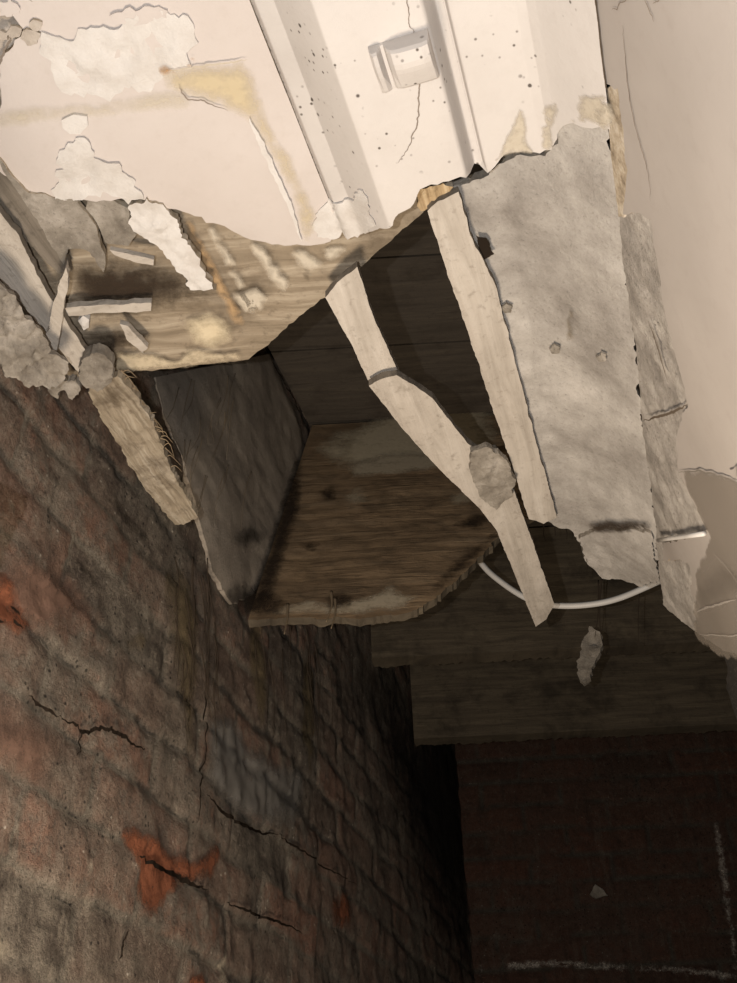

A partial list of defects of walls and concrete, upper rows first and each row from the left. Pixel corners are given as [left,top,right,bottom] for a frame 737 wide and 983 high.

peeling [51,113,144,205]
peeling [0,0,198,102]
leakage [160,59,310,241]
crack [398,84,420,163]
crack [595,0,659,187]
peeling [312,189,376,240]
crack [29,695,145,756]
crack [187,664,357,885]
crack [140,856,302,934]